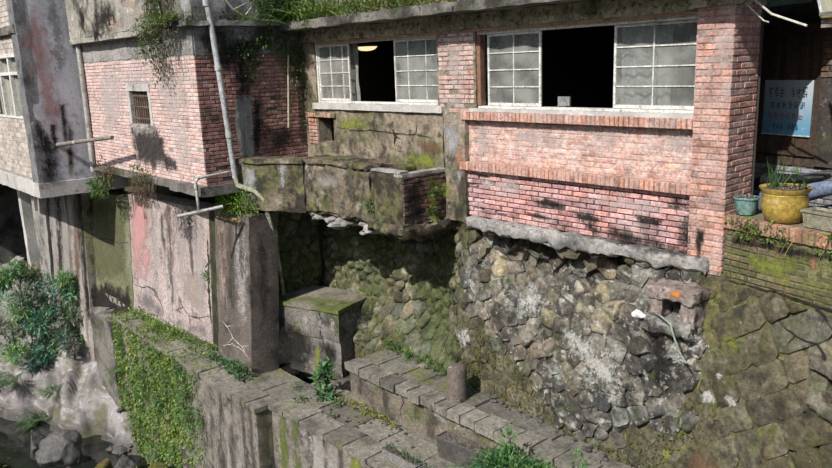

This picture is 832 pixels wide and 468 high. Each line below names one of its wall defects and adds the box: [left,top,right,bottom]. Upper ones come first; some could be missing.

leakage [78,1,122,38]
leakage [30,105,73,276]
crack [338,124,433,155]
leakage [78,193,162,317]
crack [135,240,250,359]